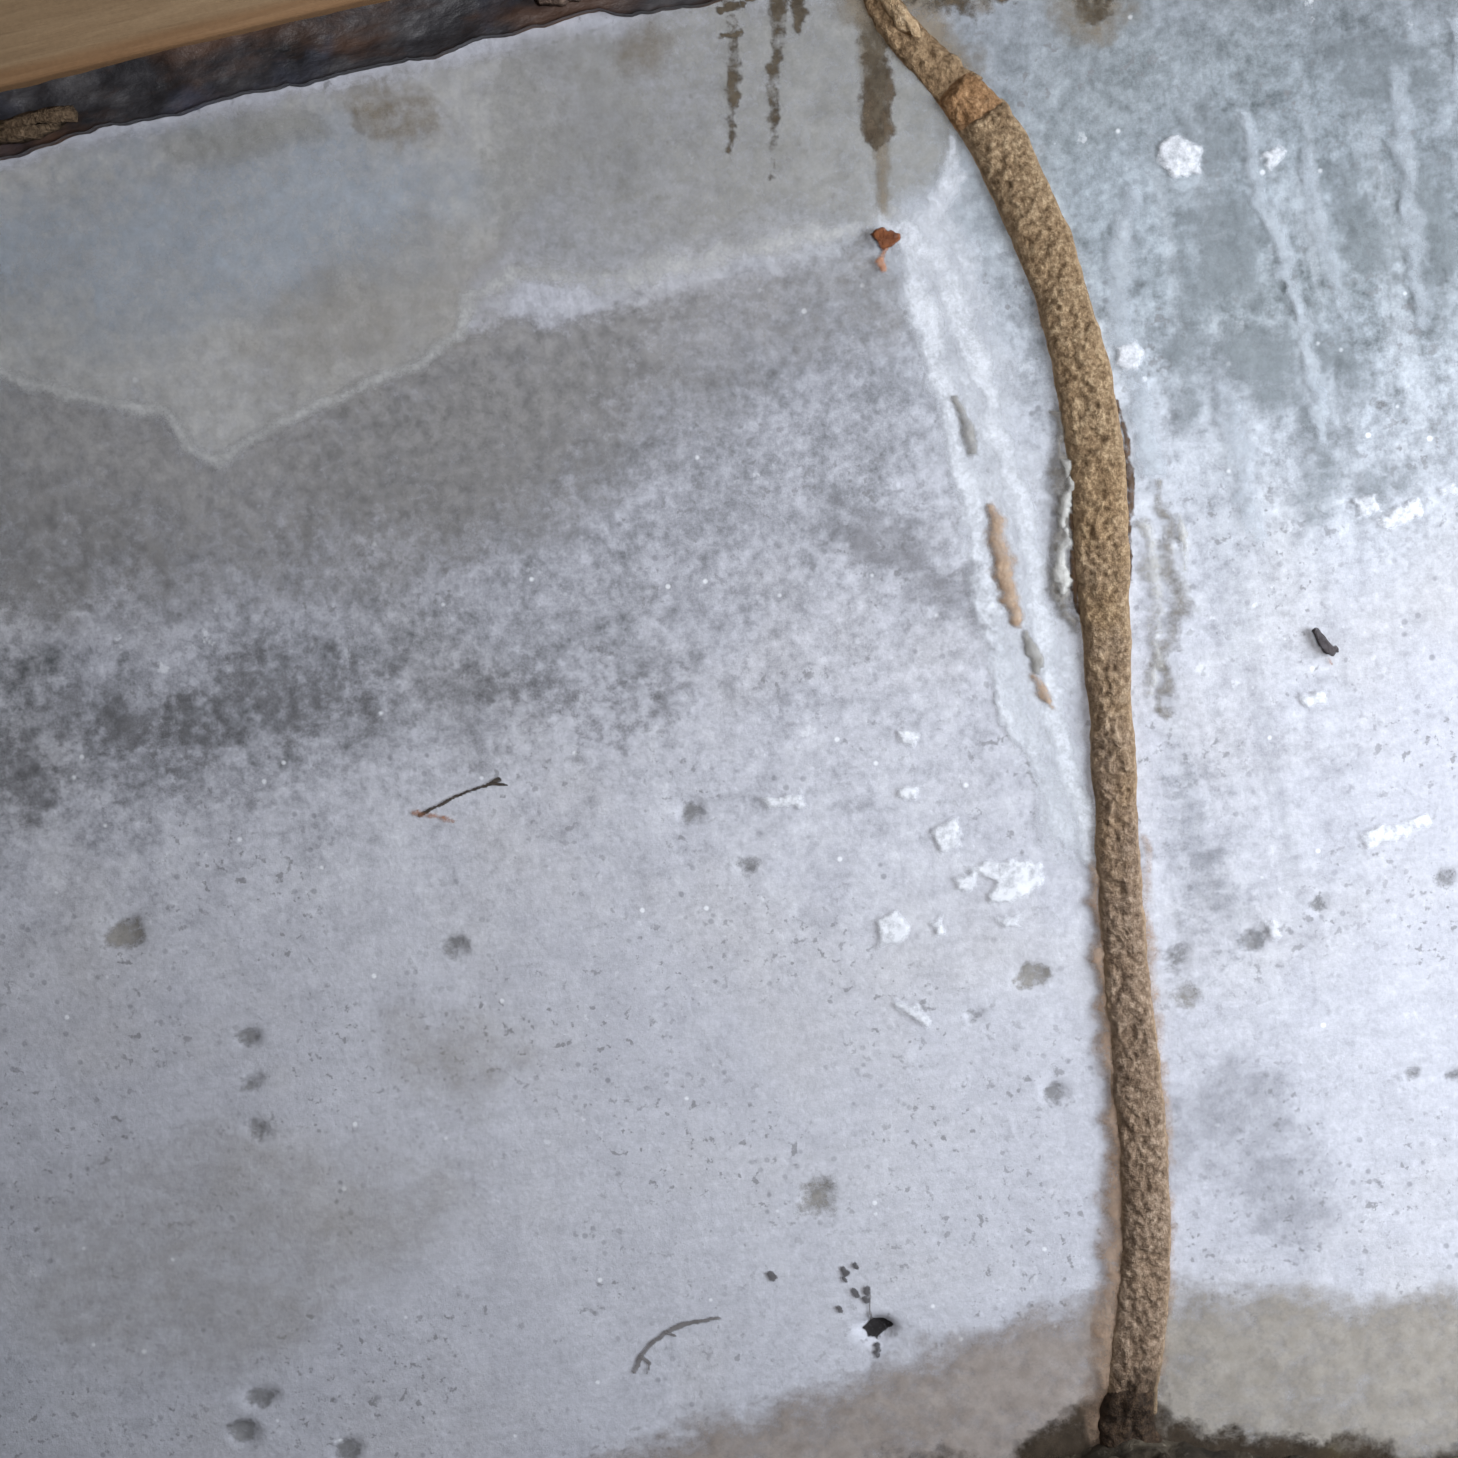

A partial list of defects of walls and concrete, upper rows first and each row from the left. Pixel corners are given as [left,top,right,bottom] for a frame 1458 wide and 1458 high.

damp [1061,0,1120,41]
rust [871,227,901,272]
damp [1109,189,1141,345]
damp [1165,112,1356,440]
damp [1338,44,1458,323]
damp [0,0,1096,868]
damp [625,1303,1115,1458]
damp [1157,1287,1458,1458]